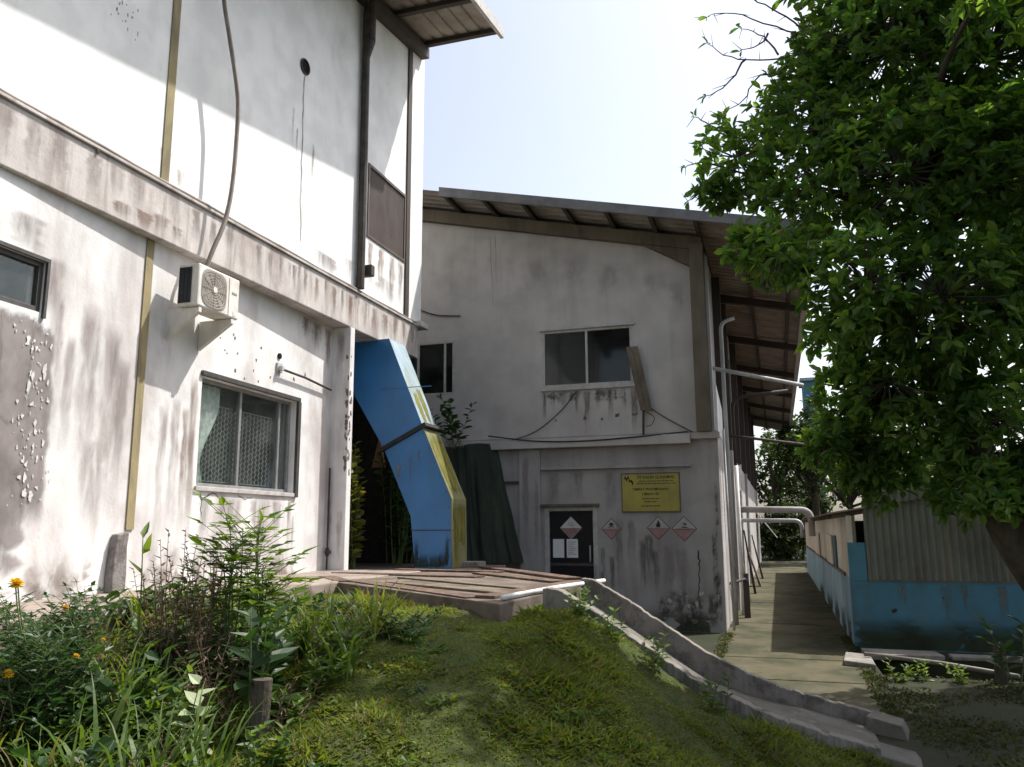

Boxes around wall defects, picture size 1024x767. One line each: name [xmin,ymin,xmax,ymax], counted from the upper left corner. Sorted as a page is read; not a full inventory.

leakage [297,76,314,216]
leakage [85,322,97,356]
peeling [0,310,65,571]
leakage [111,347,128,426]
spalling [343,372,352,475]
leakage [657,576,722,632]
leakage [820,586,1023,654]